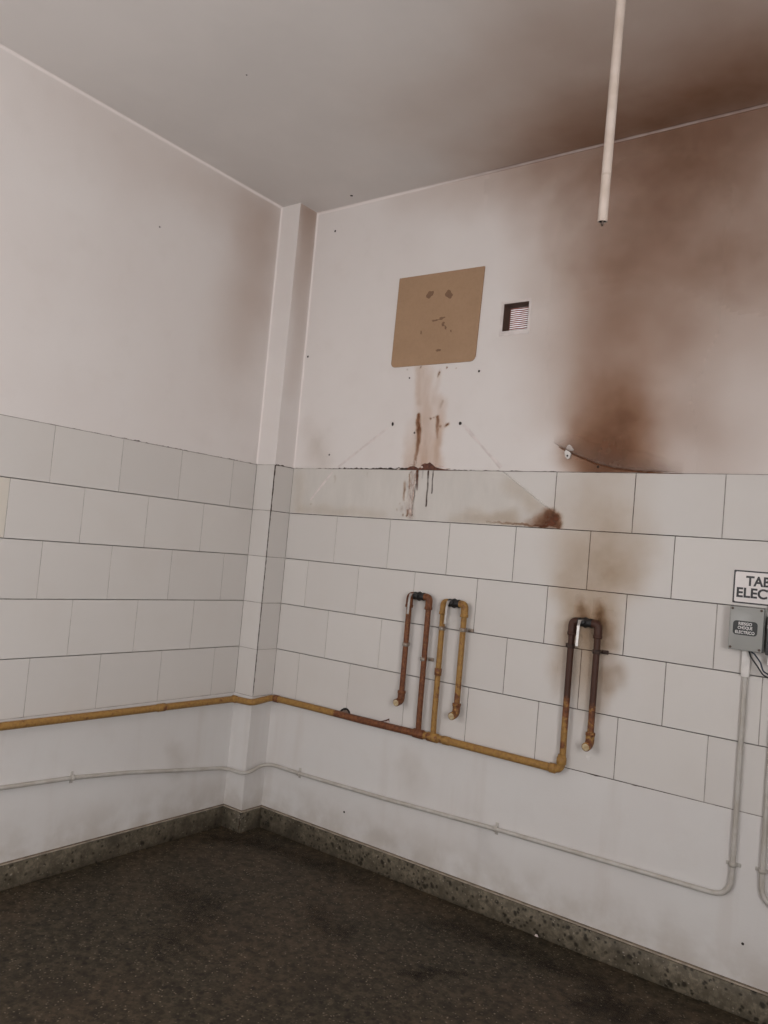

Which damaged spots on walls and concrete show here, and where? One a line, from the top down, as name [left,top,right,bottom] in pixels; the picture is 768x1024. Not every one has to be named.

corrosion [531,510,560,528]